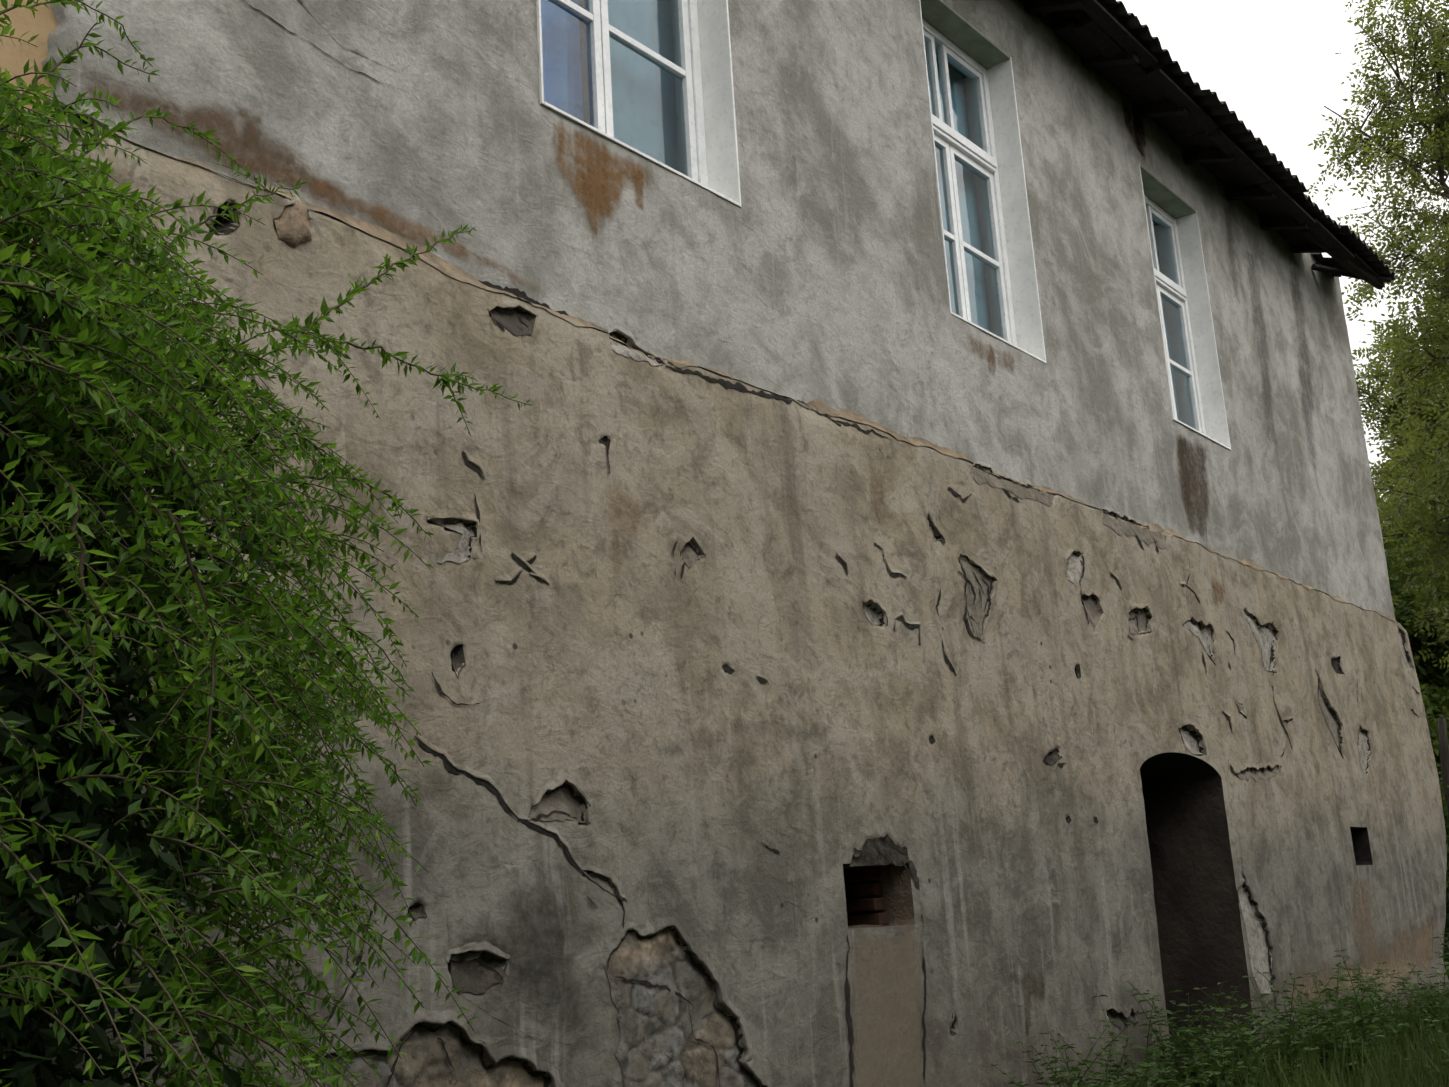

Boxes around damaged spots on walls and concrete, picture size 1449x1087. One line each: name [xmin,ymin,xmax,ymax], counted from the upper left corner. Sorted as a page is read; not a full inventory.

crack [246,2,406,92]
damp [91,84,354,212]
rust [558,129,644,232]
flaking render [488,298,537,336]
flaking render [426,493,482,564]
crack [495,549,550,585]
crack [836,541,957,676]
flaking render [928,512,999,643]
damp [1178,437,1209,535]
crack [414,732,582,873]
flaking render [323,1008,567,1087]
flaking render [603,917,772,1087]